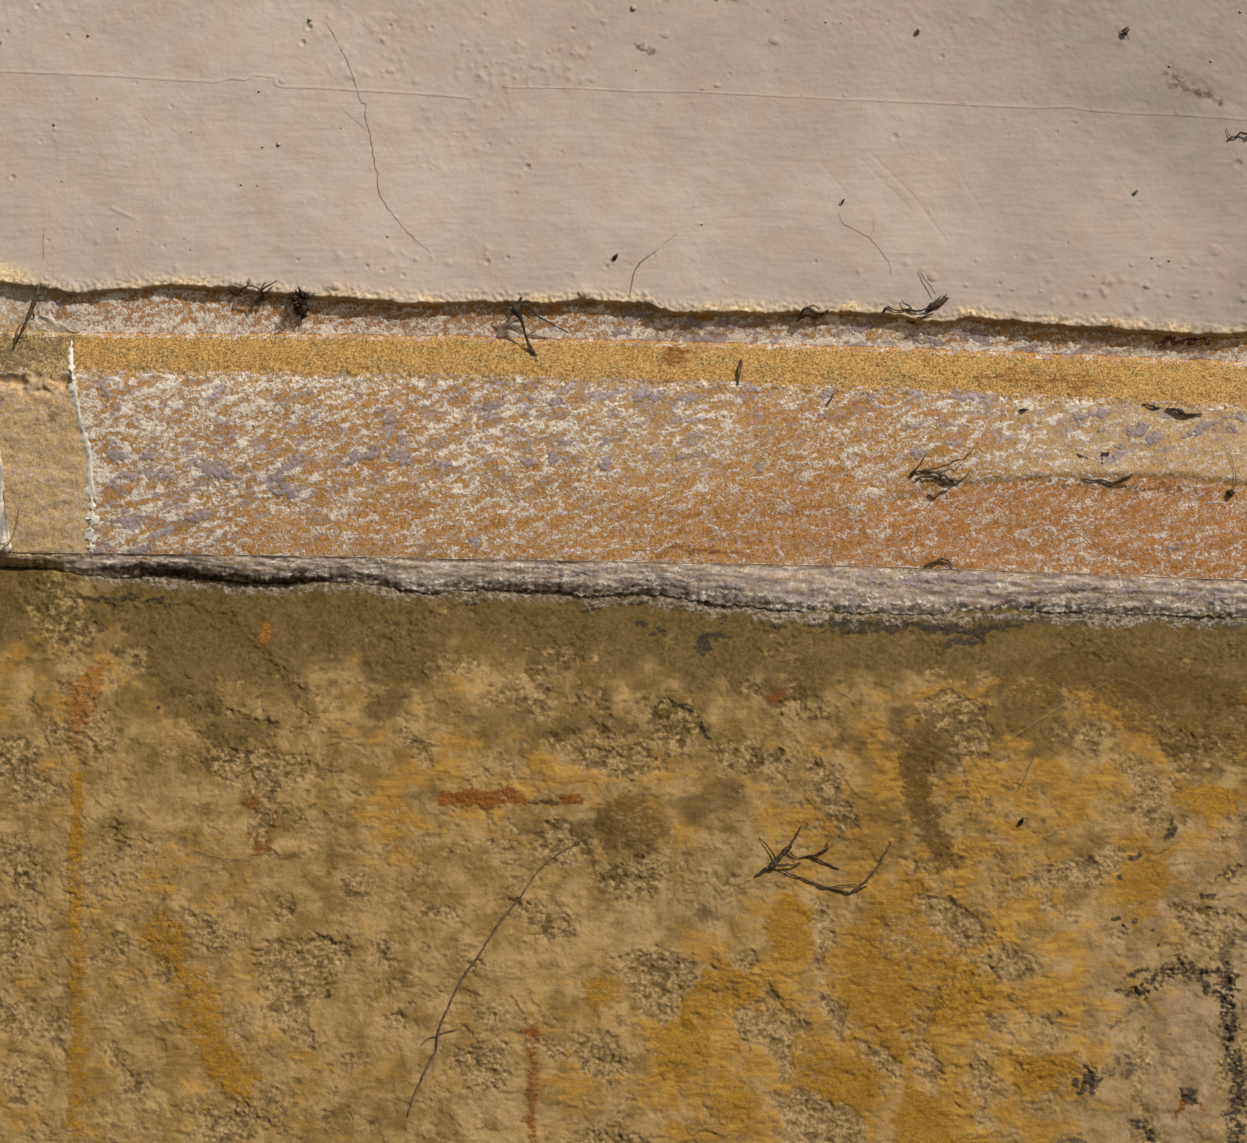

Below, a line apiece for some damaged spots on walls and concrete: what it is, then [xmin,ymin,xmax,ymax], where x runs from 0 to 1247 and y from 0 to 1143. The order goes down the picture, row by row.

crack [325,22,432,255]